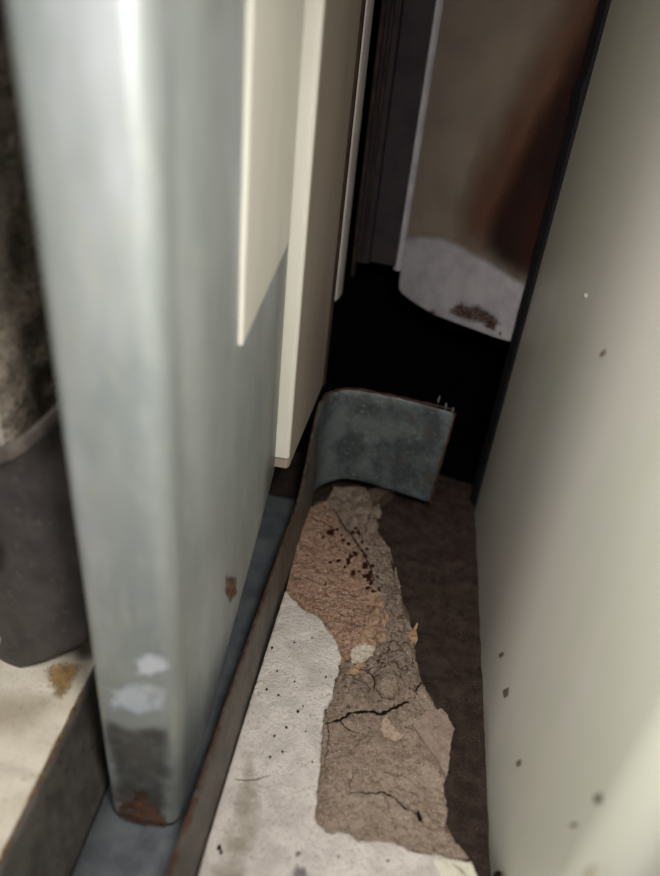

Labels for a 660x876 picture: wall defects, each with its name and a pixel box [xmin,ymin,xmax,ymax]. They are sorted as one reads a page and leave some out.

crack [325,682,422,733]
flaking render [286,486,477,876]
rust [118,790,167,826]
crack [349,769,424,823]